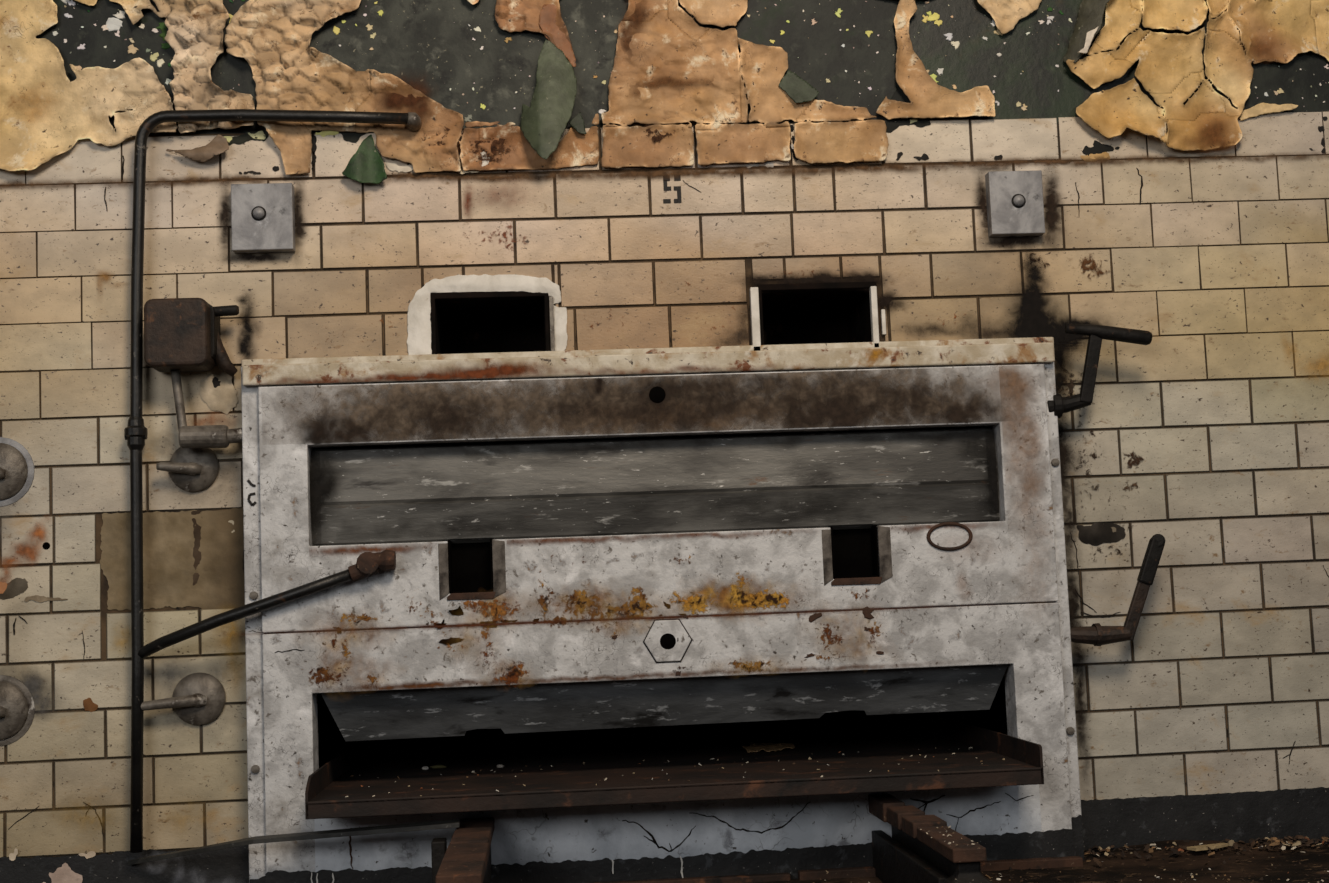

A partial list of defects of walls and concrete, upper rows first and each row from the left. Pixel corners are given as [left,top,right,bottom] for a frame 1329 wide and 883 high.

peeling [0,0,1329,175]
rust [299,365,538,383]
rust [0,527,45,583]
rust [308,612,401,687]
rust [361,571,789,690]
rust [729,589,881,673]
crack [622,802,810,852]
peeling [43,849,103,883]